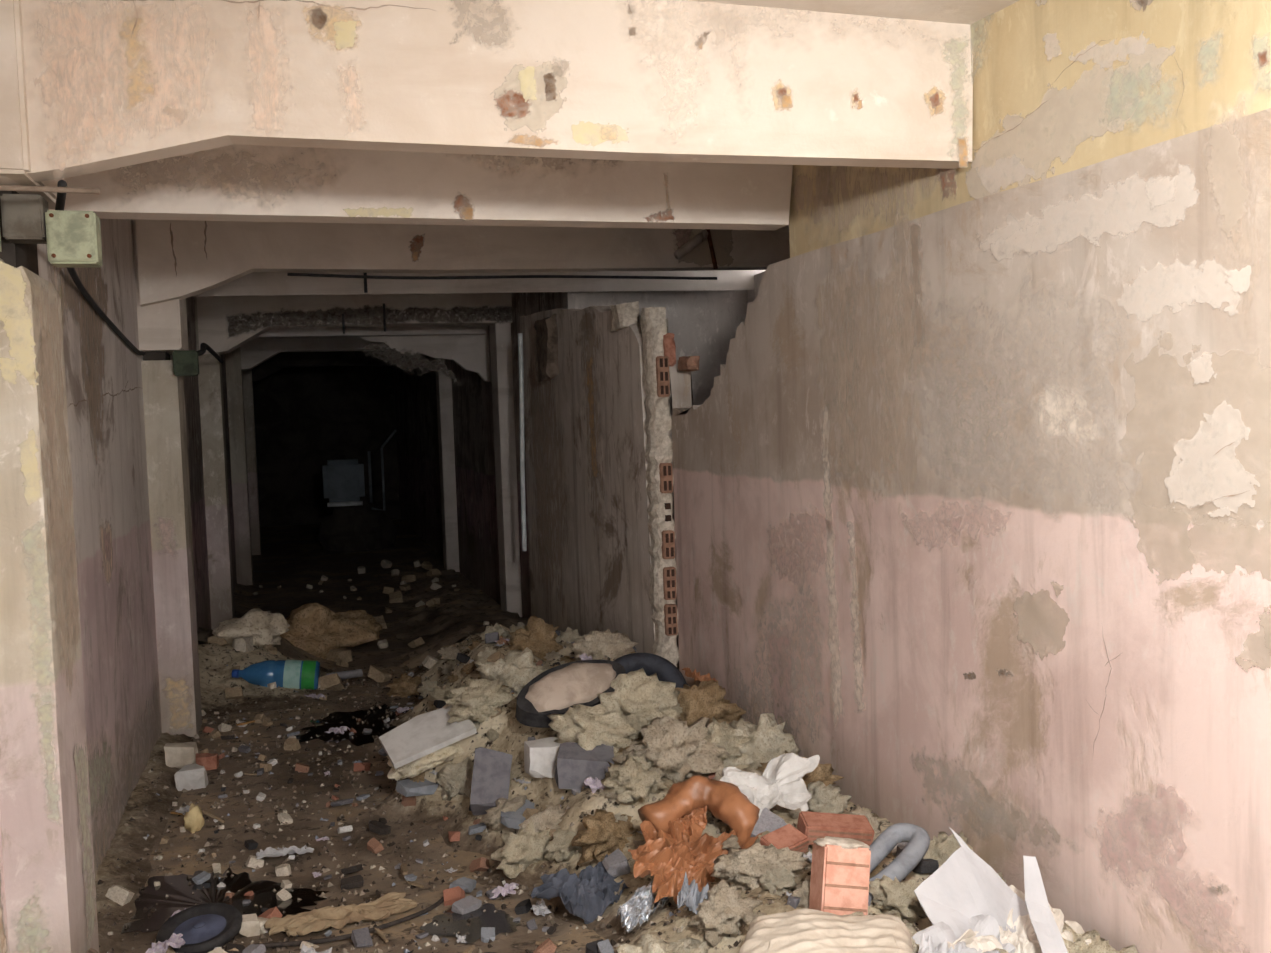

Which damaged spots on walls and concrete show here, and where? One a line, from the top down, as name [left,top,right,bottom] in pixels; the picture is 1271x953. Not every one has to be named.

peeling [1130,0,1153,11]
flaking render [492,61,570,147]
peeling [571,121,629,147]
rust [772,82,792,109]
peeling [1116,256,1253,321]
peeling [1119,333,1271,584]
damp [822,411,864,717]
peeling [1013,581,1069,660]
peeling [1235,605,1271,672]